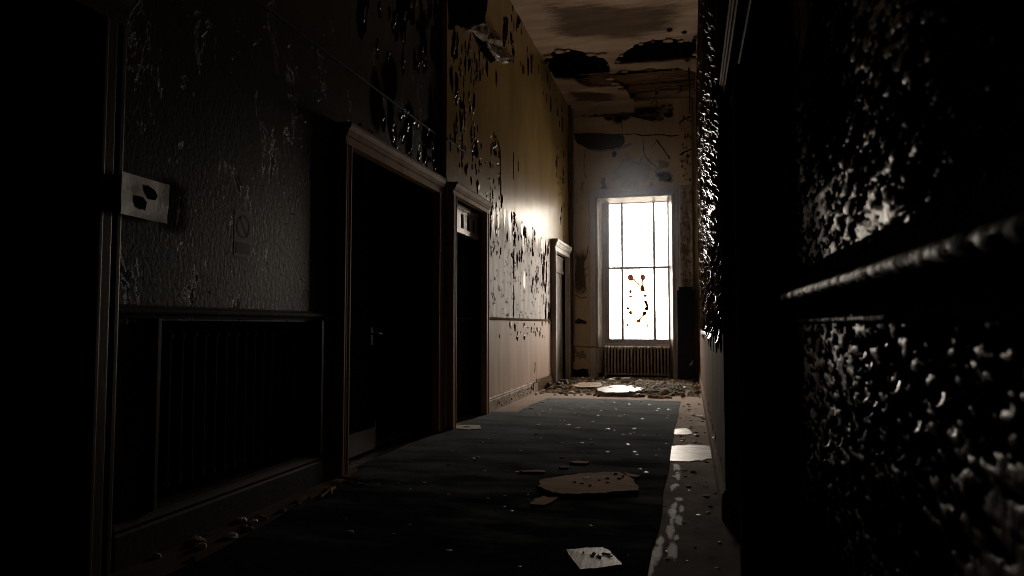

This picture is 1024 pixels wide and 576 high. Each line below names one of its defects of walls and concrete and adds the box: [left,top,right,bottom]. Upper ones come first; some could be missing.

spalling [347,0,722,353]
crack [617,122,678,167]